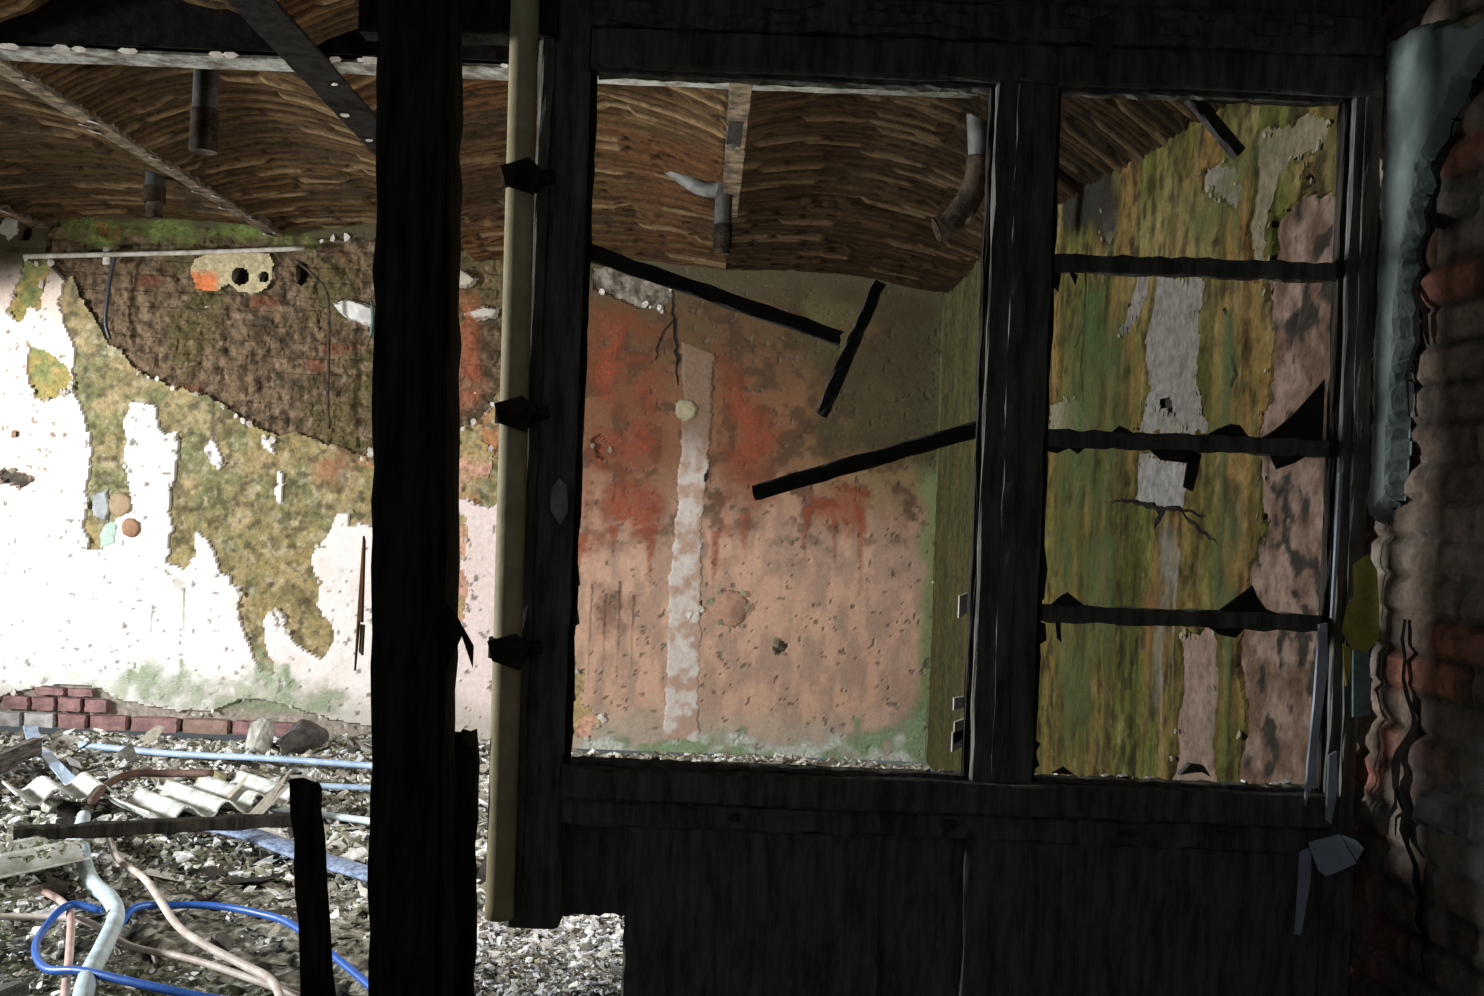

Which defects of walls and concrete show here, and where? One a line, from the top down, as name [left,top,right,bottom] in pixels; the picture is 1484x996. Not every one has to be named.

peeling [1199,113,1335,264]
spalling [0,467,35,488]
spalling [6,215,375,674]
spalling [444,245,504,669]
peeling [1049,395,1089,431]
peeling [1135,451,1186,508]
peeling [1117,277,1208,435]
spalling [1236,279,1331,784]
spalling [0,684,371,737]
peeling [1169,627,1218,782]
crack [1387,619,1428,980]